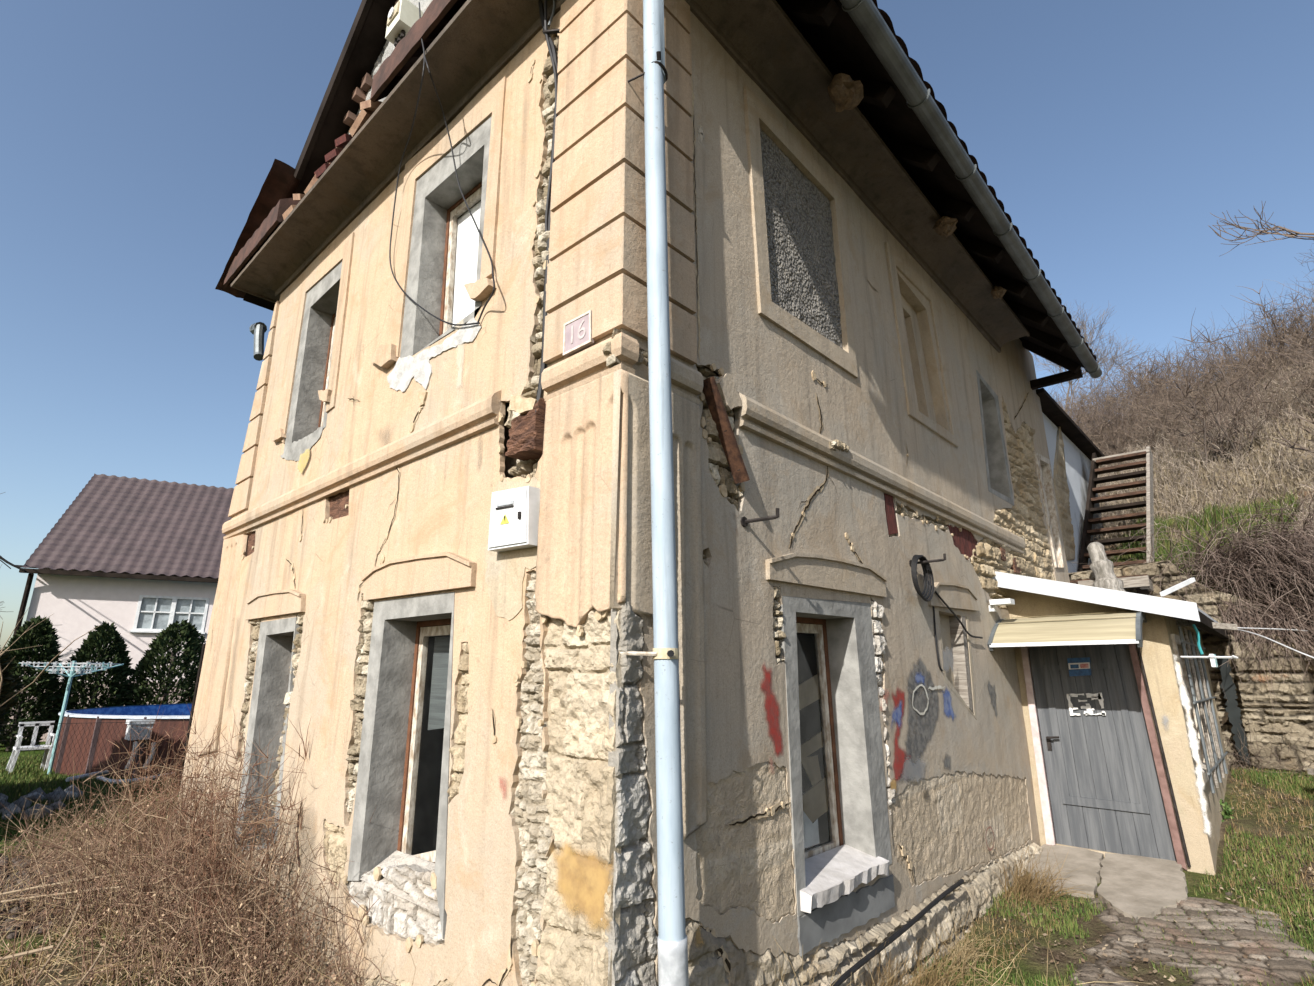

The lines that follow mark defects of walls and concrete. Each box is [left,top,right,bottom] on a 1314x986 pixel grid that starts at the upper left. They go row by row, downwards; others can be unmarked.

crack [357,467,400,600]
crack [407,405,424,435]
peeling [387,317,482,407]
spalling [697,363,745,509]
crack [789,466,837,549]
crack [811,370,828,434]
spalling [964,400,1075,609]
spalling [773,586,786,663]
spalling [323,595,374,890]
spalling [447,642,469,800]
spalling [535,592,658,986]
spalling [685,599,1042,986]